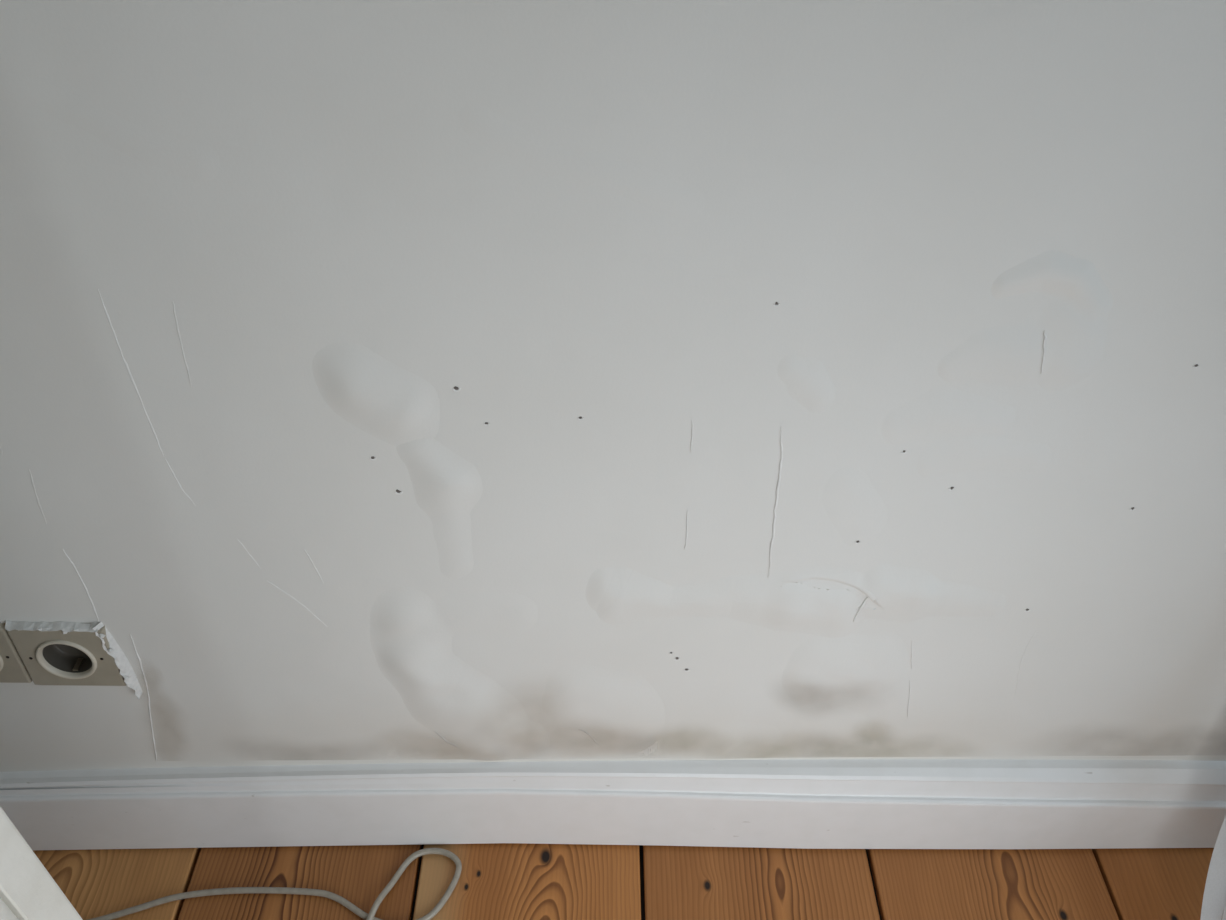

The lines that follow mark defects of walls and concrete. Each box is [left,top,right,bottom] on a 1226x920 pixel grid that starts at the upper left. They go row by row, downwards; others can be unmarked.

crack [767,427,783,578]
peeling [5,620,142,699]